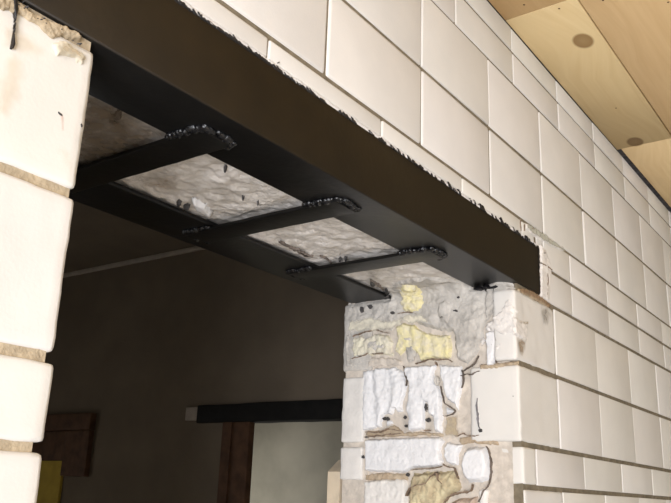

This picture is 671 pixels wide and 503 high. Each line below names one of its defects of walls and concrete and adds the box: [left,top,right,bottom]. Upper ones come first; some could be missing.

spalling [399,285,424,312]
crack [403,356,479,388]
spalling [352,323,490,503]
crack [440,386,456,416]